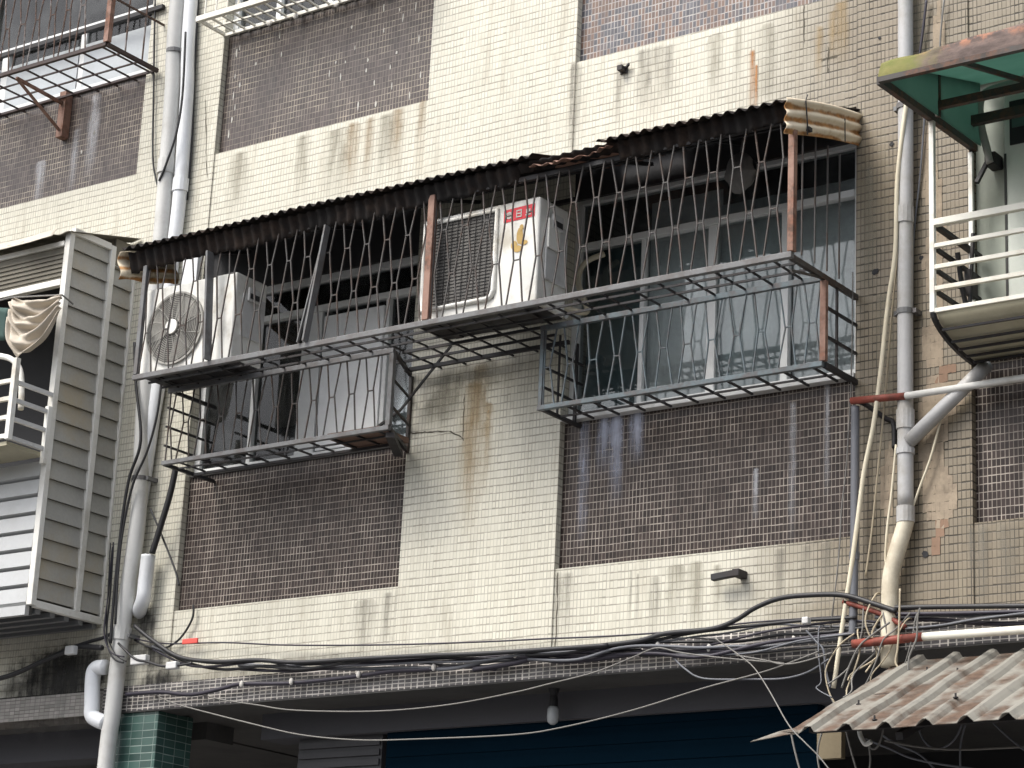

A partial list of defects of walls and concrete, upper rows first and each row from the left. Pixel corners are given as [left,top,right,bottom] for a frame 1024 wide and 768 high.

crack [411,395,465,441]
damp [602,416,621,465]
spalling [918,397,965,558]
damp [6,648,98,698]